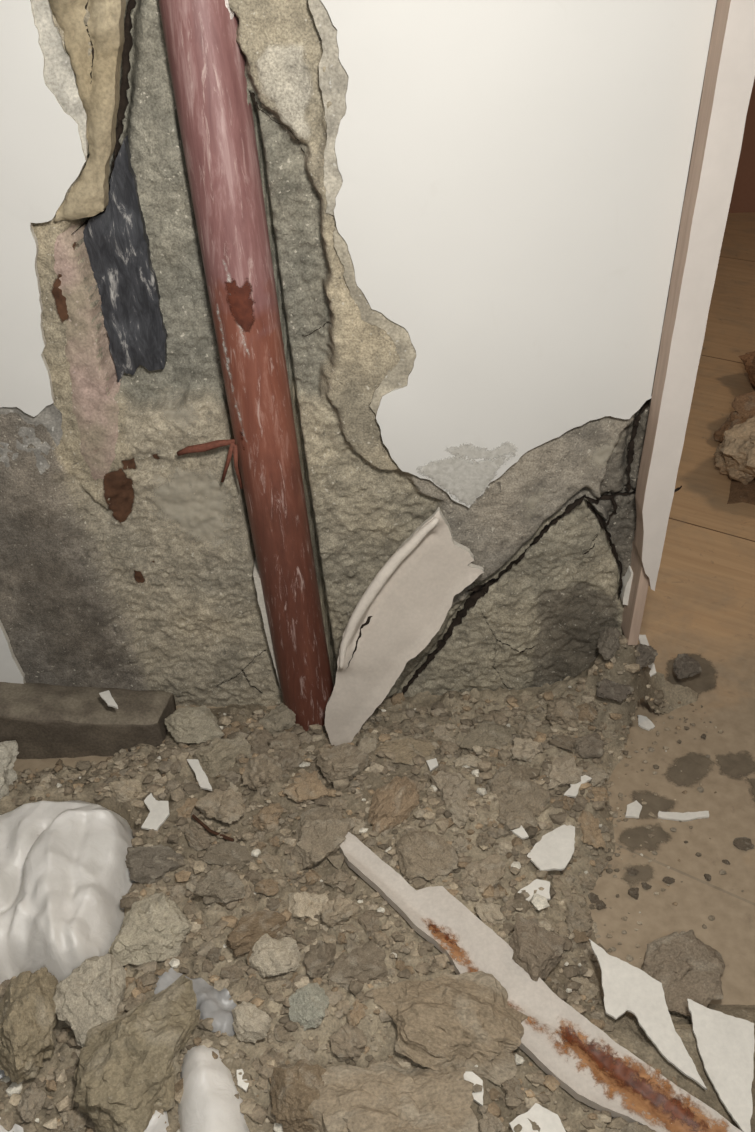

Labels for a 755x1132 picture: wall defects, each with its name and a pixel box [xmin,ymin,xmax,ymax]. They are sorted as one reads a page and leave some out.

spalling [0,0,284,707]
rust [225,278,256,332]
spalling [228,0,655,746]
crack [402,399,651,695]